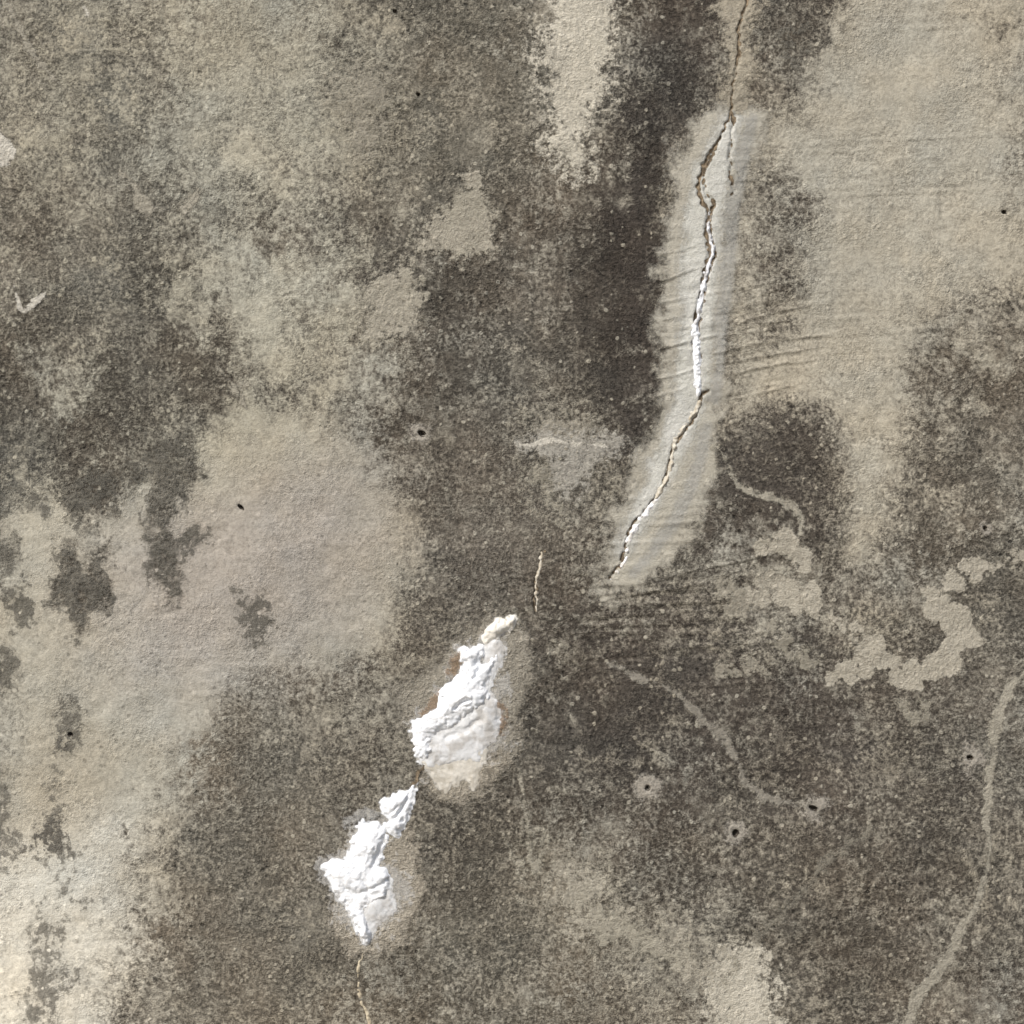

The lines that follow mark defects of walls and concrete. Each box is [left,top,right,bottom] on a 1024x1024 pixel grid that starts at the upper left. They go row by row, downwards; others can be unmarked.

crack [608,0,749,580]
crack [533,550,546,612]
water stain [320,603,539,958]
crack [357,954,372,1024]